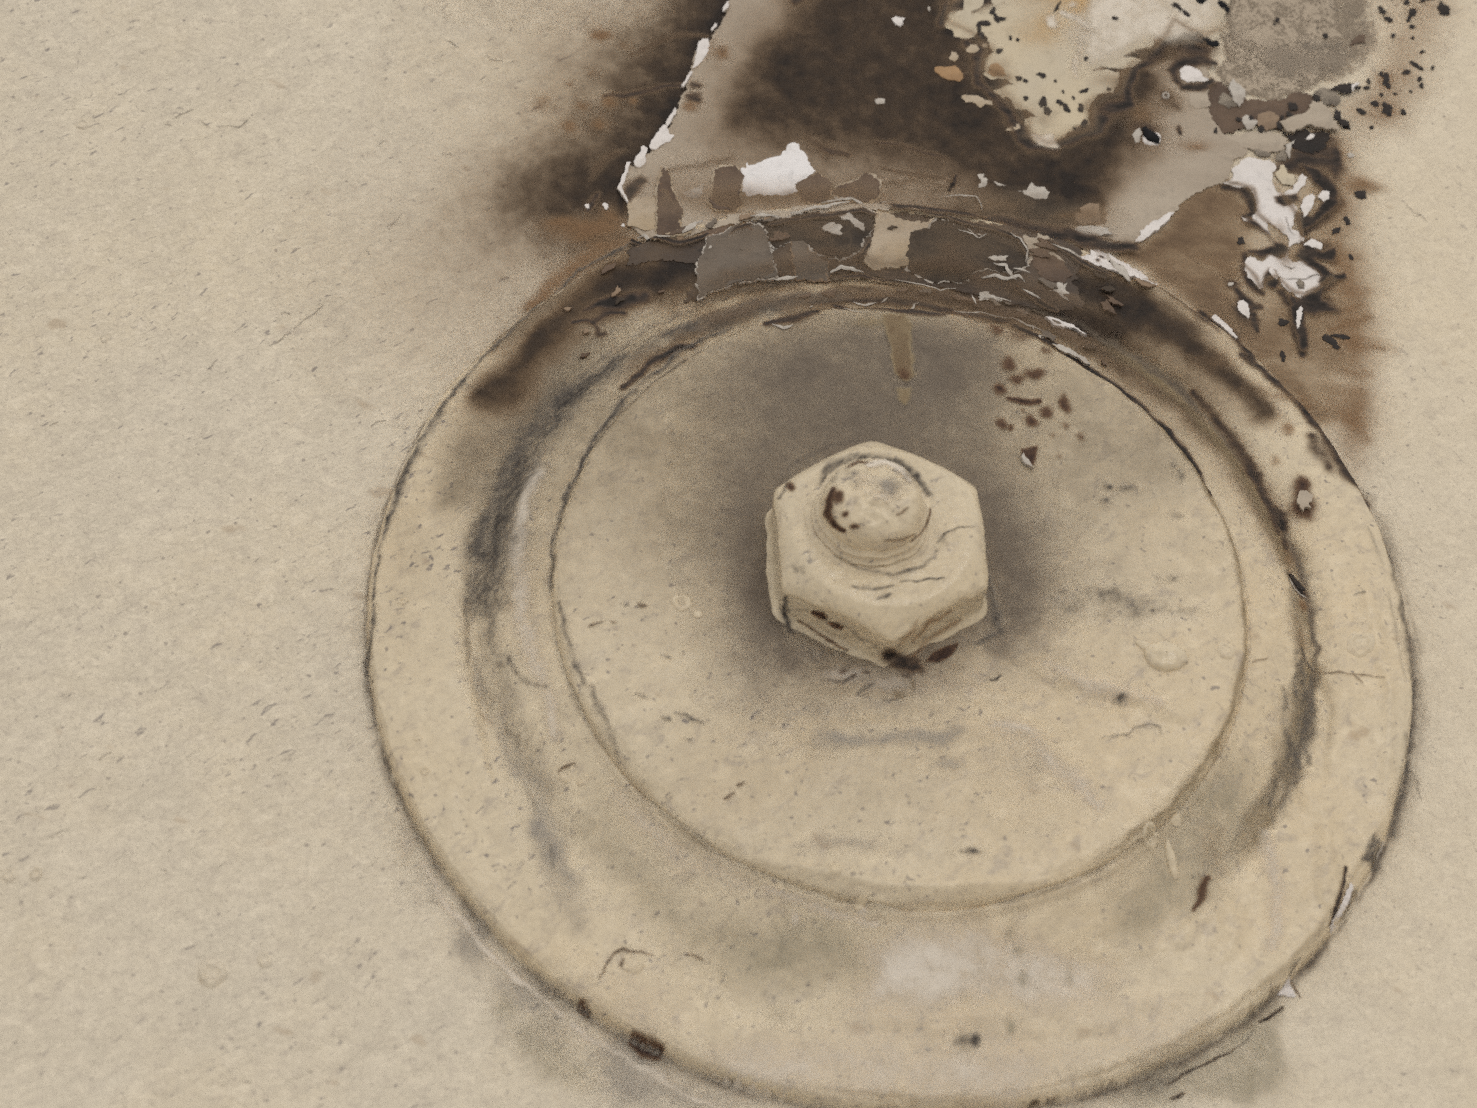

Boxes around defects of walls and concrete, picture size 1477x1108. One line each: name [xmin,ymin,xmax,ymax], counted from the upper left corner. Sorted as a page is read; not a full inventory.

peeling [602,0,1380,366]
corrosion [994,347,1083,439]